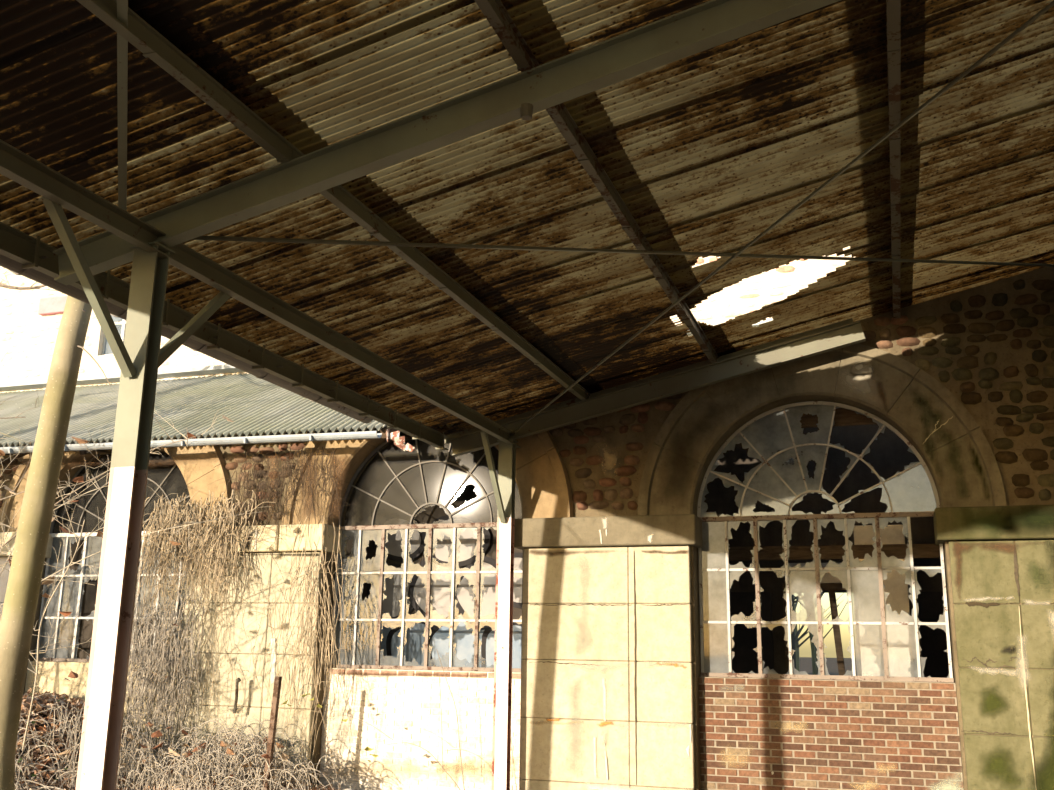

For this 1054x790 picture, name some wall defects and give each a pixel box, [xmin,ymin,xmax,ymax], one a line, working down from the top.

leakage [983,690,1006,713]
leakage [985,753,1018,783]
leakage [1035,734,1054,790]